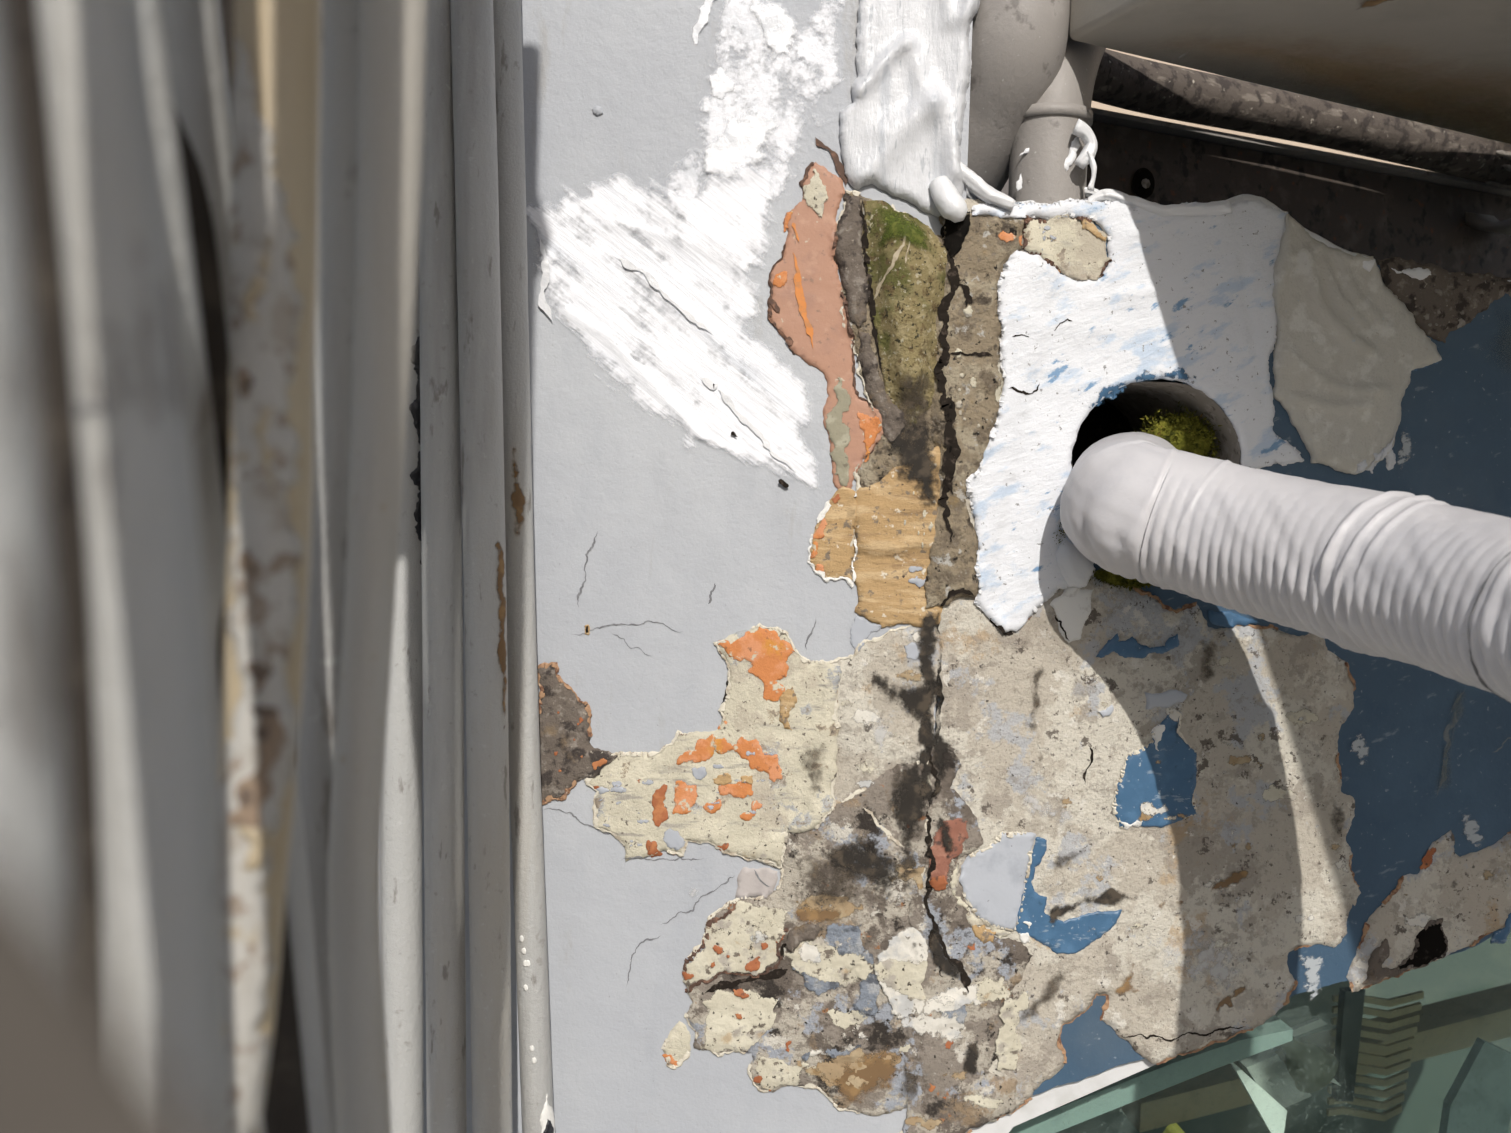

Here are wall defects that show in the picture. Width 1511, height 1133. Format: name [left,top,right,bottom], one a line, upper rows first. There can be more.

crack [859,200,883,374]
crack [934,248,1072,542]
peeling [218,40,304,1133]
crack [940,588,1013,636]
flaking render [537,137,1511,1133]
crack [863,751,971,993]